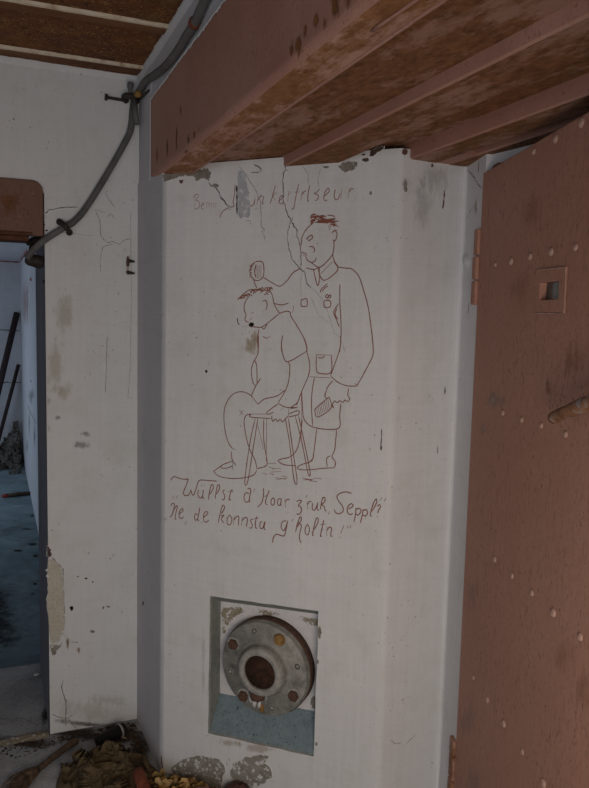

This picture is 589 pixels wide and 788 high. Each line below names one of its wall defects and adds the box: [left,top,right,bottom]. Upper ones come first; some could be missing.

crack [208,182,232,210]
crack [242,164,265,239]
crack [282,159,345,350]
spalling [45,546,73,655]
peeling [161,754,273,788]